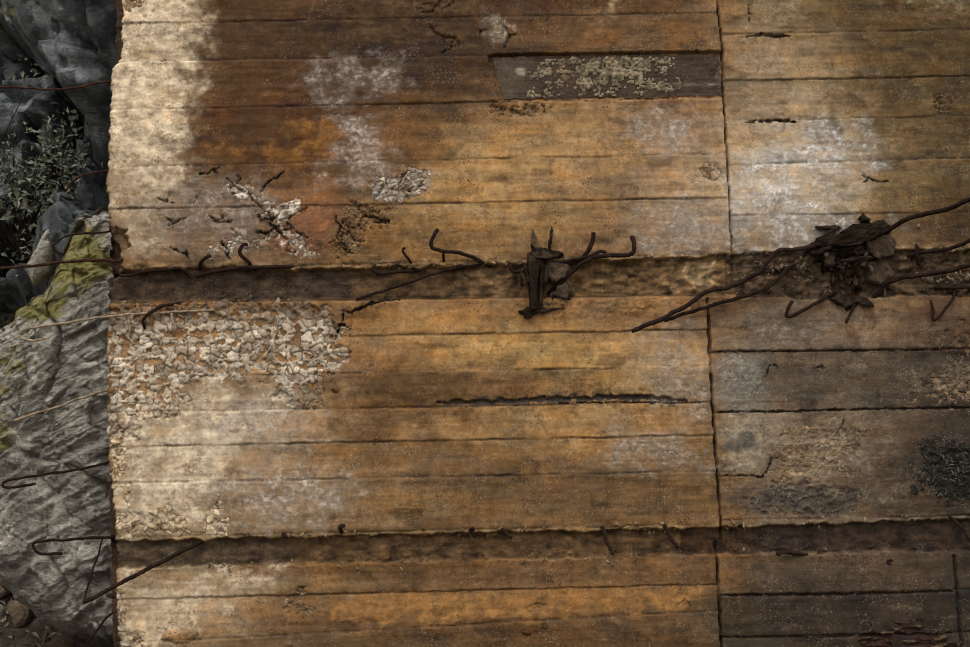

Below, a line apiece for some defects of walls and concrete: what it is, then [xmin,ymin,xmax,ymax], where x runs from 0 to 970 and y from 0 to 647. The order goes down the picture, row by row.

water stain [353,0,510,46]
water stain [305,57,397,107]
water stain [107,0,276,254]
water stain [330,117,388,194]
spalling [0,167,431,278]
spalling [547,232,637,300]
spalling [631,242,824,333]
spalling [784,291,837,319]
spalling [845,197,970,255]
spalling [871,238,970,321]
spalling [909,319,970,411]
spalling [1,291,351,647]